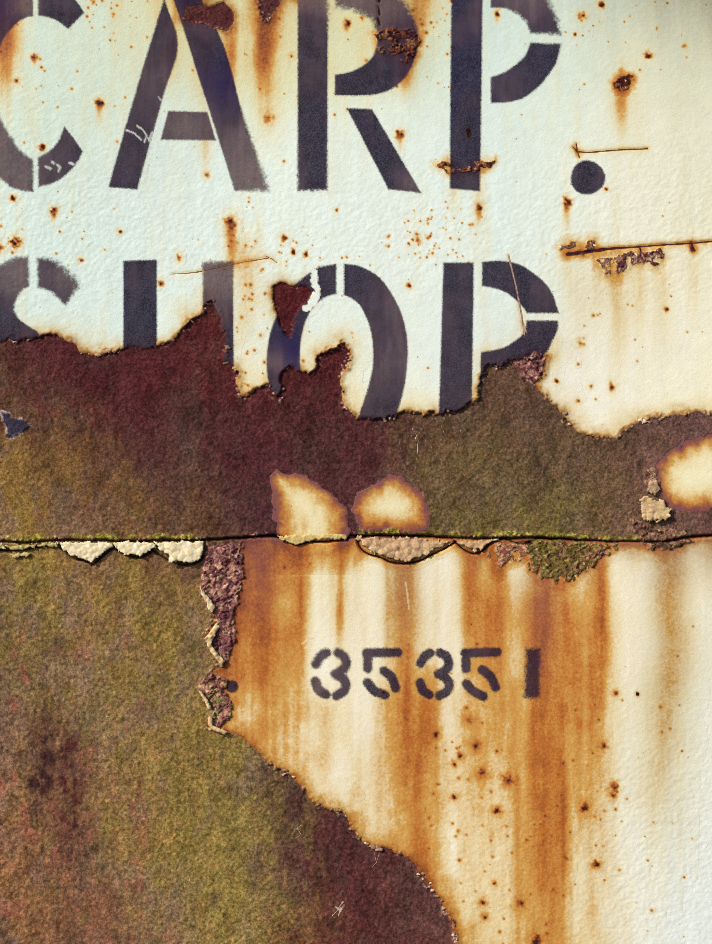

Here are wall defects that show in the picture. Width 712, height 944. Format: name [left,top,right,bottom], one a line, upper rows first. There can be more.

corrosion [103,0,174,96]
corrosion [164,26,209,113]
corrosion [223,0,297,165]
corrosion [329,0,450,158]
corrosion [602,44,660,144]
peeling [253,264,327,356]
peeling [0,540,204,563]
crack [0,528,712,574]
corrosion [0,191,712,944]
peeling [278,533,499,562]
peeling [639,480,672,523]
peeling [200,587,225,666]